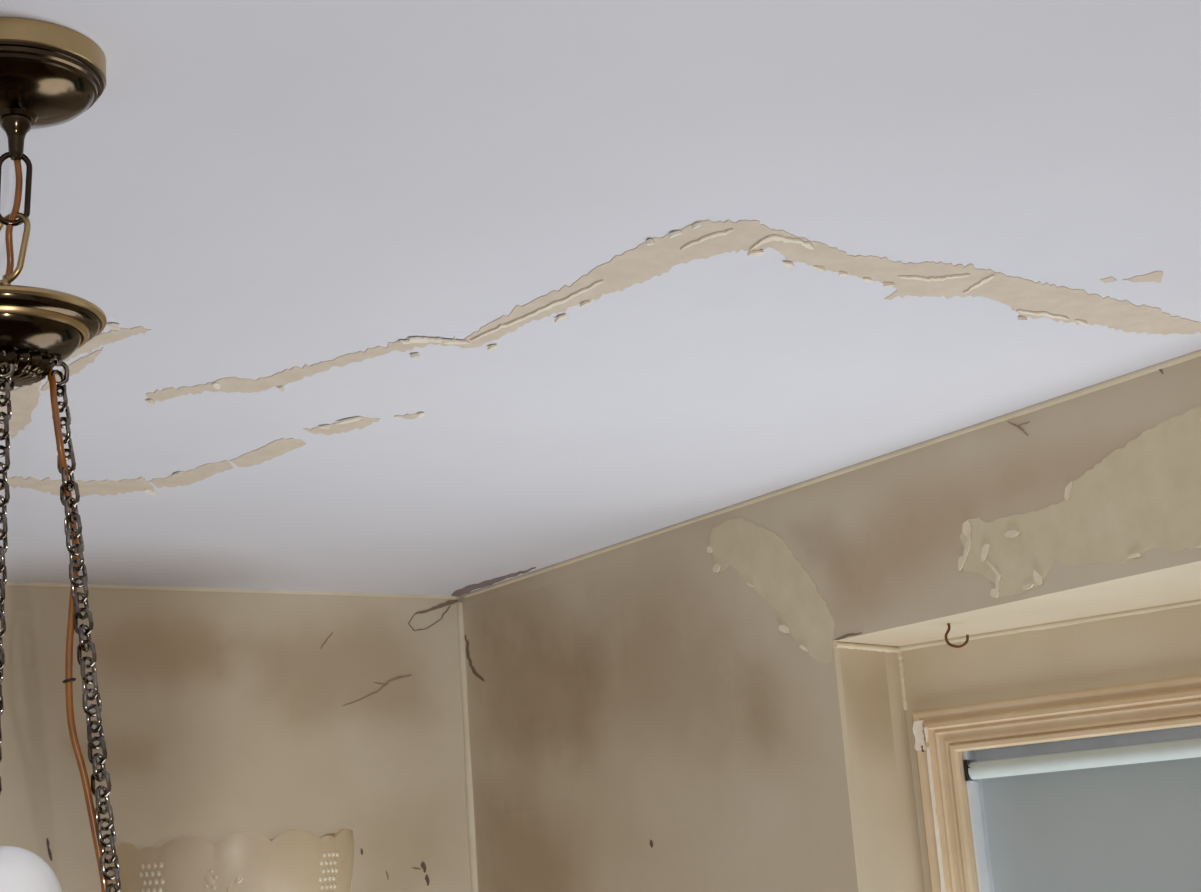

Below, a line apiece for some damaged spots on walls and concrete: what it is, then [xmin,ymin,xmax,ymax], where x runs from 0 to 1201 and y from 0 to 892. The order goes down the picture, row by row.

peeling [146,219,1201,405]
peeling [0,323,151,439]
peeling [0,412,425,497]
peeling [958,406,1201,598]
crack [408,567,536,681]
crack [344,675,411,706]